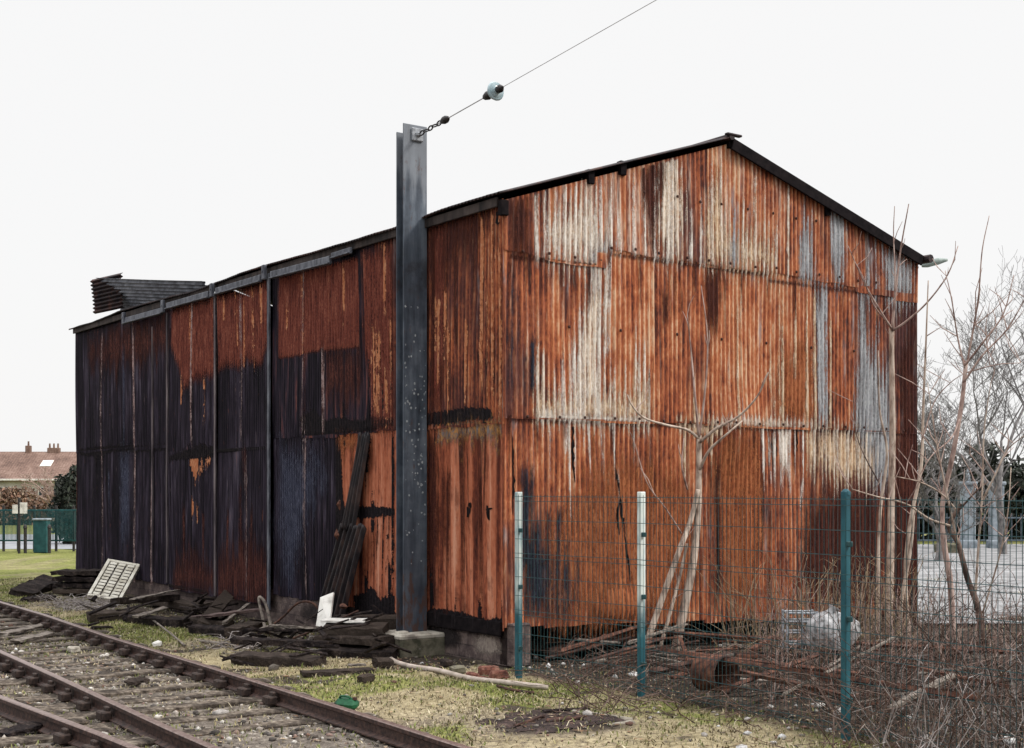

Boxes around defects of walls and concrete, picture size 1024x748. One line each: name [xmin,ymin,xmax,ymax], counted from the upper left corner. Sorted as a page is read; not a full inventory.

corrosion [338,431,357,463]
corrosion [427,432,486,612]
corrosion [427,208,495,418]
corrosion [507,163,917,636]
damp [762,422,804,506]